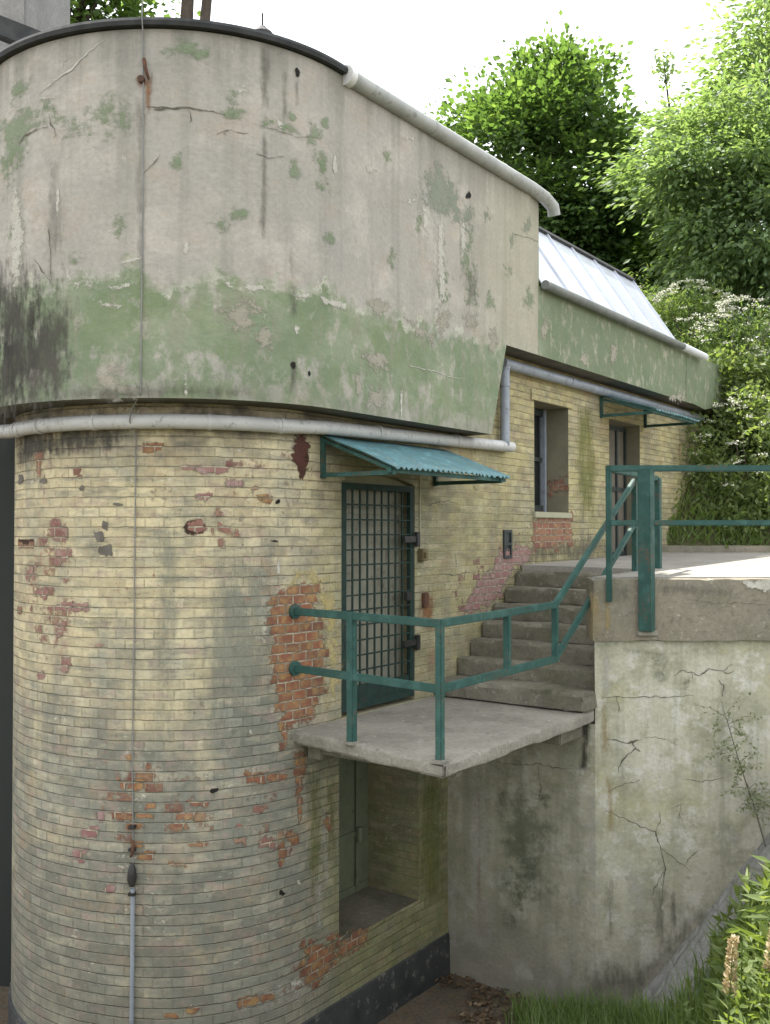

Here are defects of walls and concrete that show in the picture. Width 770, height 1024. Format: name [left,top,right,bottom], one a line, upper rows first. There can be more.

crack [20,41,102,142]
crack [147,106,315,158]
damp [0,274,69,409]
flaking render [17,518,90,644]
spalling [183,493,241,549]
flaking render [180,450,290,514]
spalling [283,434,312,485]
flaking render [451,510,575,615]
flaking render [233,561,329,867]
crack [604,664,734,710]
flaking render [73,754,218,863]
crack [606,737,721,899]